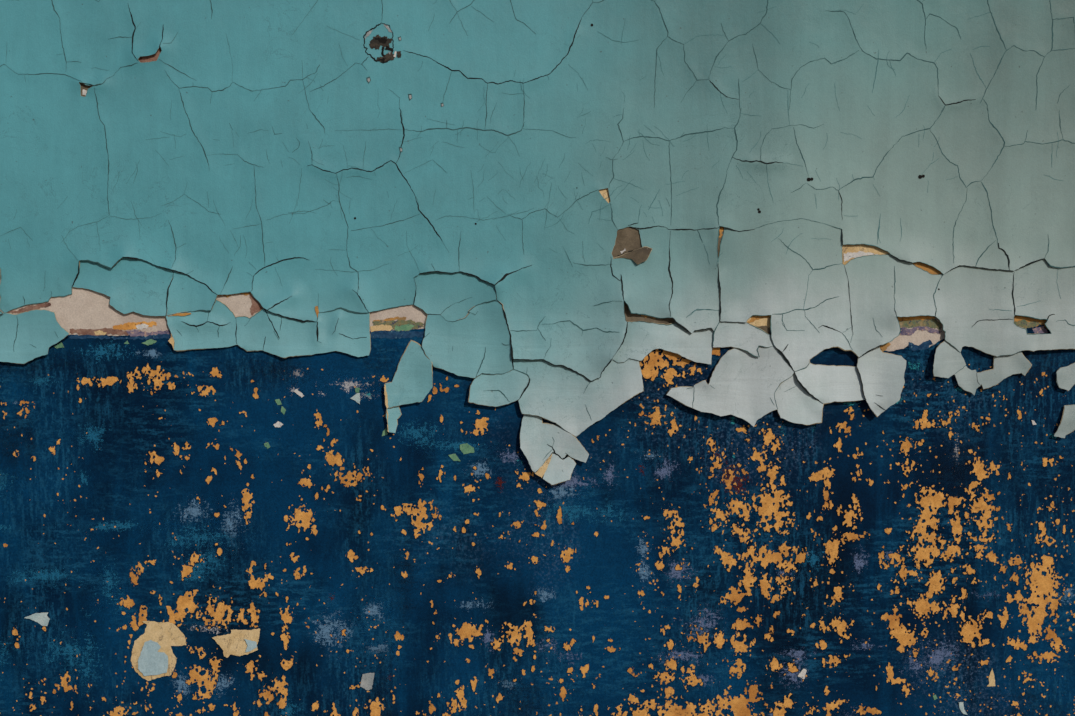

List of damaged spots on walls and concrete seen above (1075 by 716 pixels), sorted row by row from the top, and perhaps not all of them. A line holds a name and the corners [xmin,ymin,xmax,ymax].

spalling [363,22,401,63]
crack [0,0,1075,421]
peeling [0,219,1075,485]